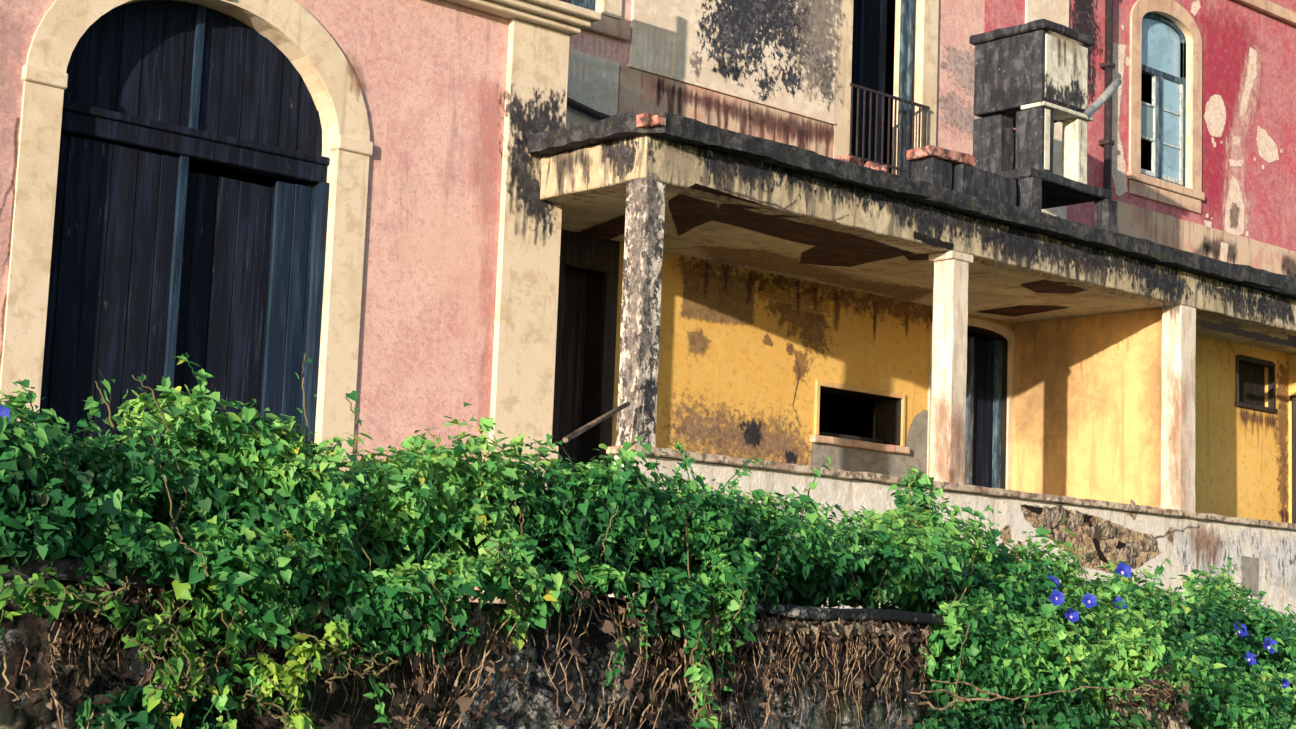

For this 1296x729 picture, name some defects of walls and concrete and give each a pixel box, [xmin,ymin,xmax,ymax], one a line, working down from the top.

water stain [657,0,845,156]
water stain [1038,0,1103,116]
water stain [1201,12,1255,264]
peeling [1204,46,1282,238]
peeling [639,172,663,421]
peeling [681,269,831,380]
water stain [498,83,1296,428]
spalling [904,231,954,261]
water stain [667,393,811,466]
spalling [1000,525,1023,548]
spalling [1021,499,1296,600]